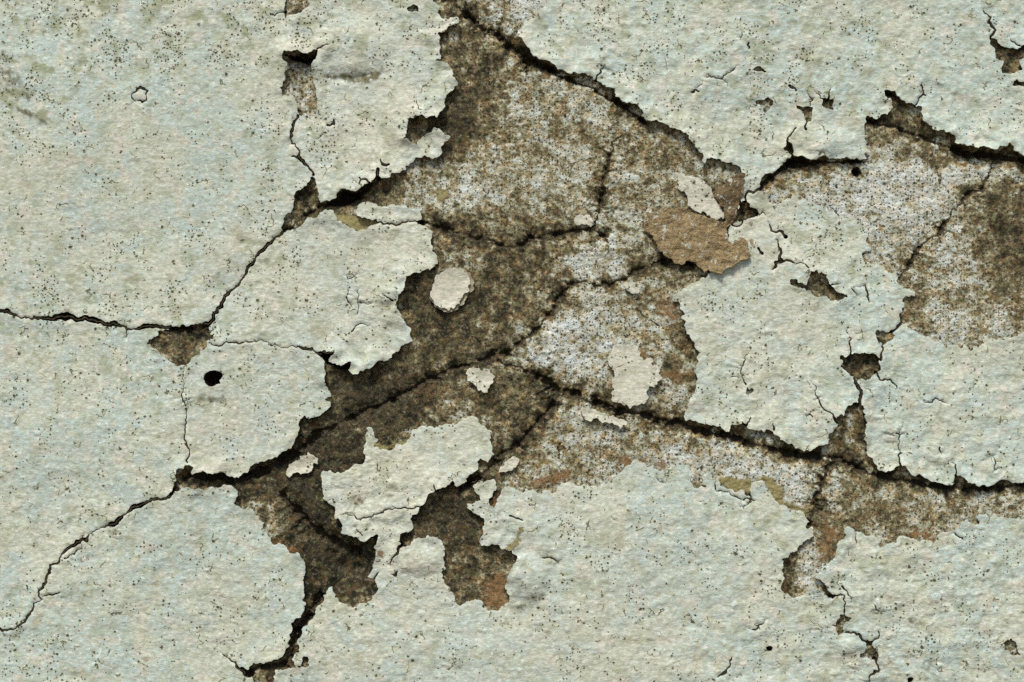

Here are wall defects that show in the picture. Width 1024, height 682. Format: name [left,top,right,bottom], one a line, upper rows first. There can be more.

crack [690,32,750,93]
crack [983,10,1020,47]
crack [290,115,335,176]
crack [0,204,335,358]
peeling [147,323,214,366]
peeling [231,0,1024,682]
peeling [173,465,226,491]
crack [0,258,1024,631]
crack [223,591,325,677]
crack [829,585,880,682]